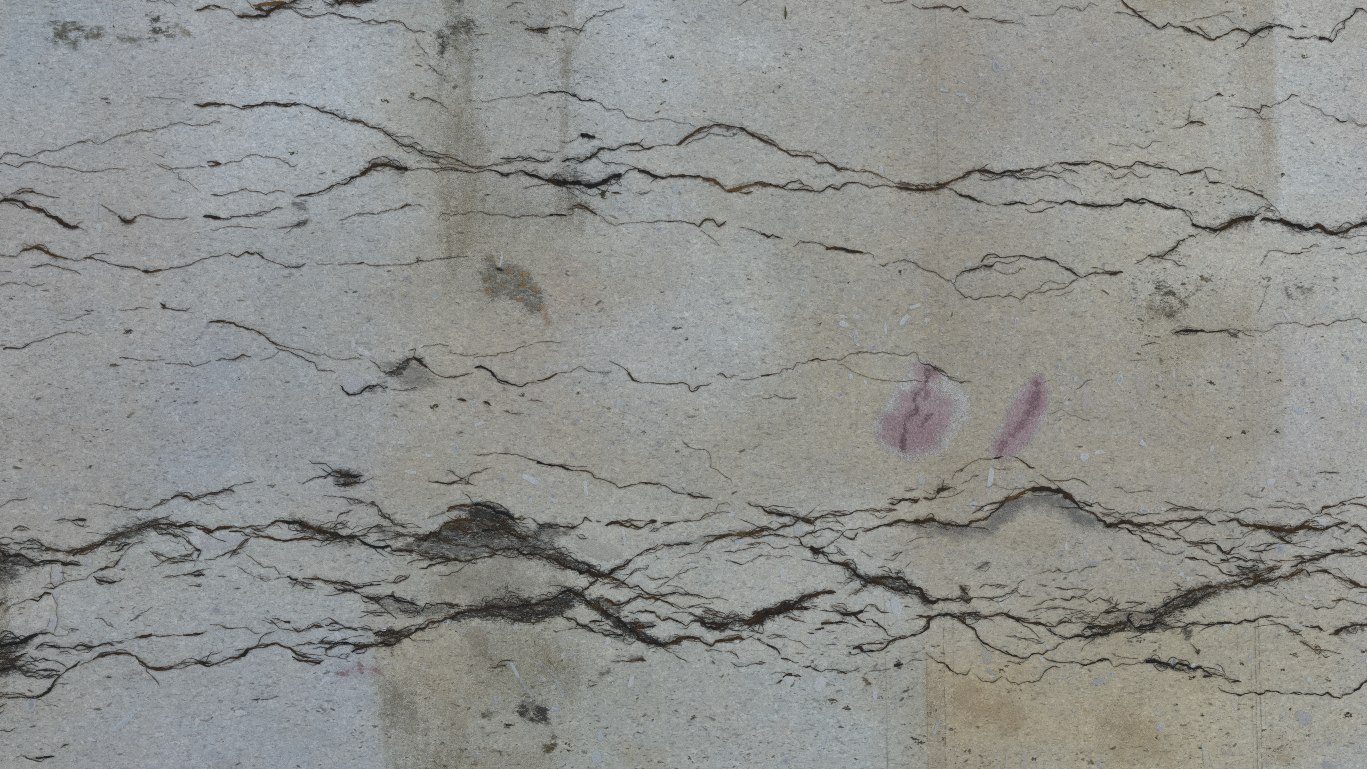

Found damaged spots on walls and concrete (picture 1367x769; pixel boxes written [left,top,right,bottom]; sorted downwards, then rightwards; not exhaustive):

crack [0,0,1367,416]
crack [0,432,1367,762]